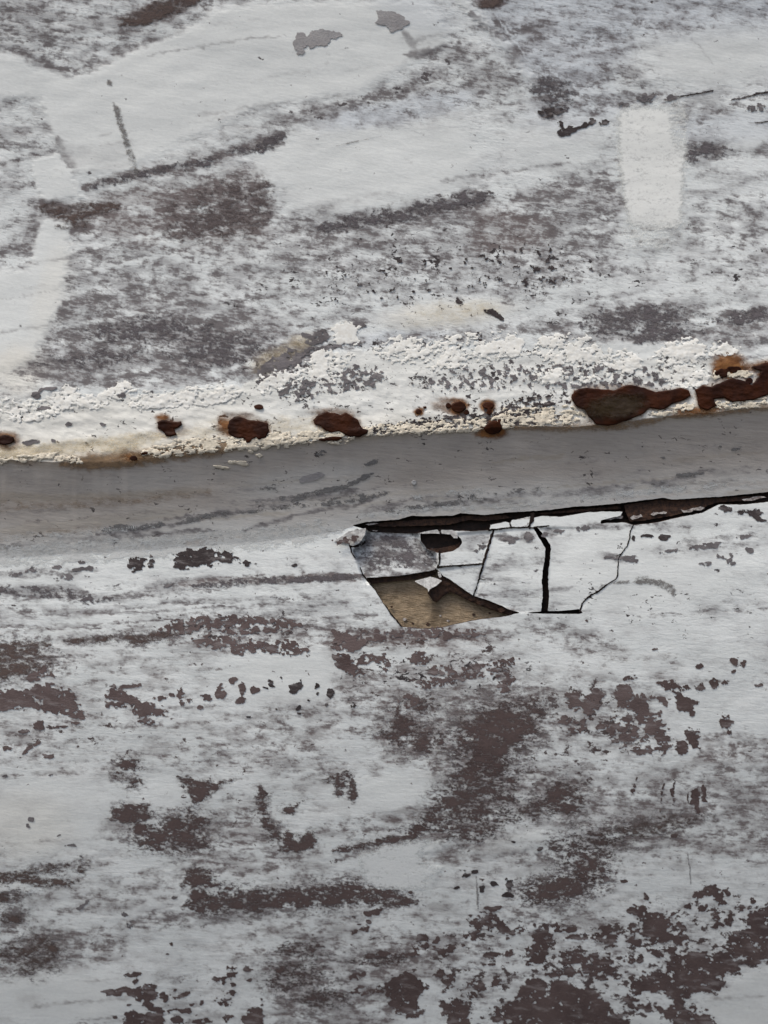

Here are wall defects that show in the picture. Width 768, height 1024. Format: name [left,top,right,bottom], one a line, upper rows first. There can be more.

peeling [293,29,344,55]
rust [571,352,768,426]
rust [156,414,182,437]
rust [217,404,270,443]
rust [313,409,368,441]
rust [414,398,506,438]
water stain [506,404,768,431]
water stain [59,440,235,469]
crack [433,513,634,614]
peeling [0,614,310,759]
peeling [101,492,768,1024]
peeling [0,834,91,983]